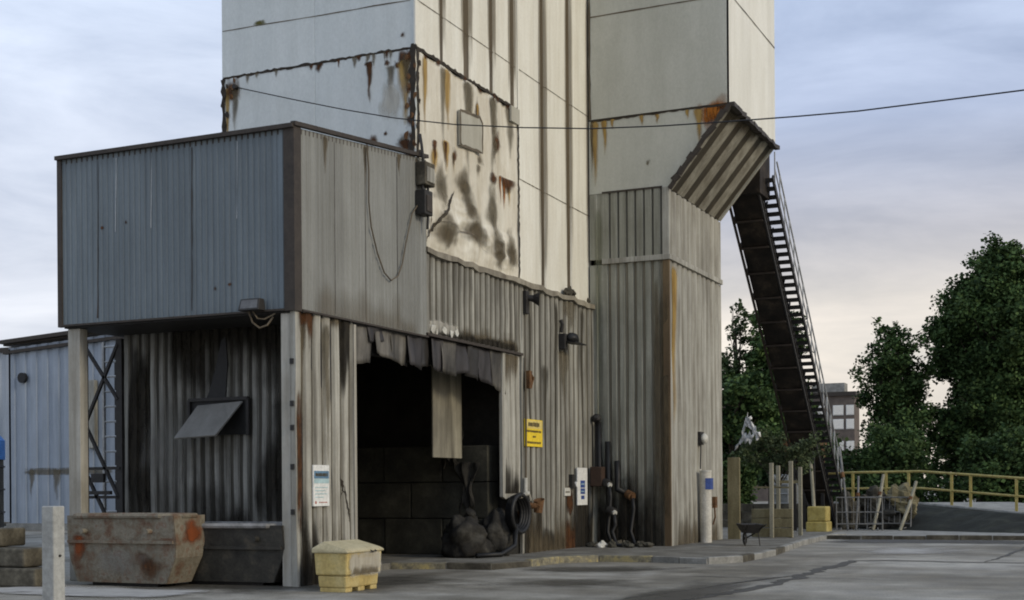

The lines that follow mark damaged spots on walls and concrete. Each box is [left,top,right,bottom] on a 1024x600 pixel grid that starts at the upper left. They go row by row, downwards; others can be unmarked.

corrosion [222,33,521,278]
corrosion [590,101,757,174]
water stain [437,169,517,265]
water stain [322,327,330,420]
peeling [430,321,459,338]
corrosion [655,268,677,513]